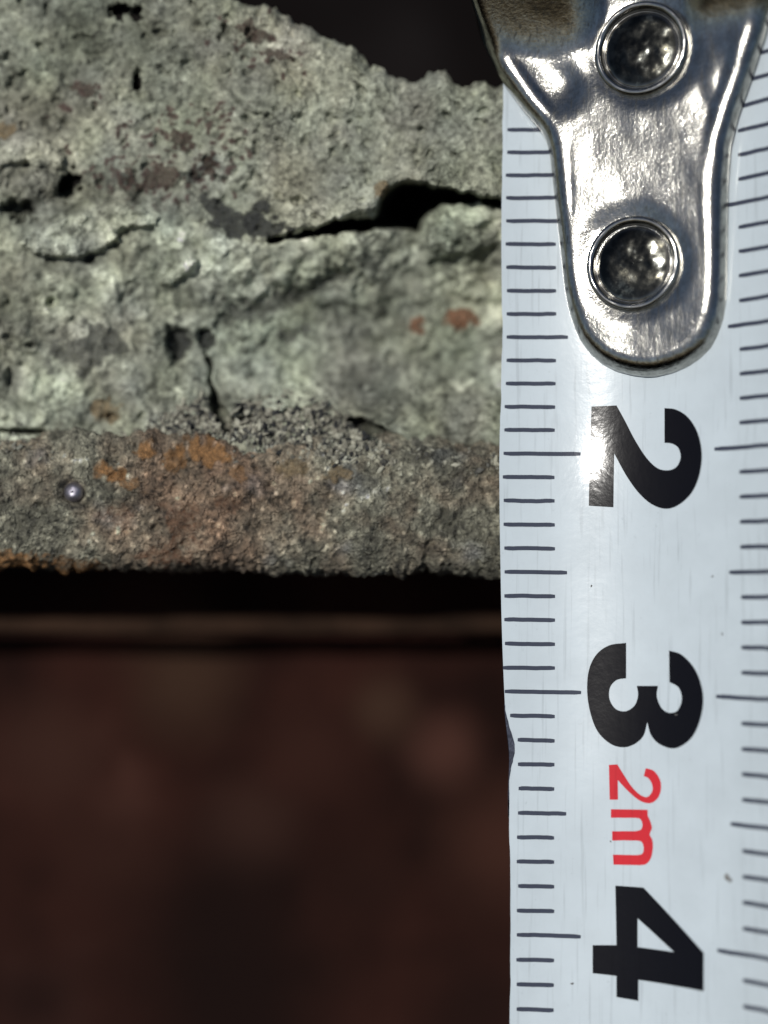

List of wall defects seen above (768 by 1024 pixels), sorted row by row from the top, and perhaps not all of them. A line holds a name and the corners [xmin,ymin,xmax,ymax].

crack [268,183,502,243]
rust [137,435,232,470]